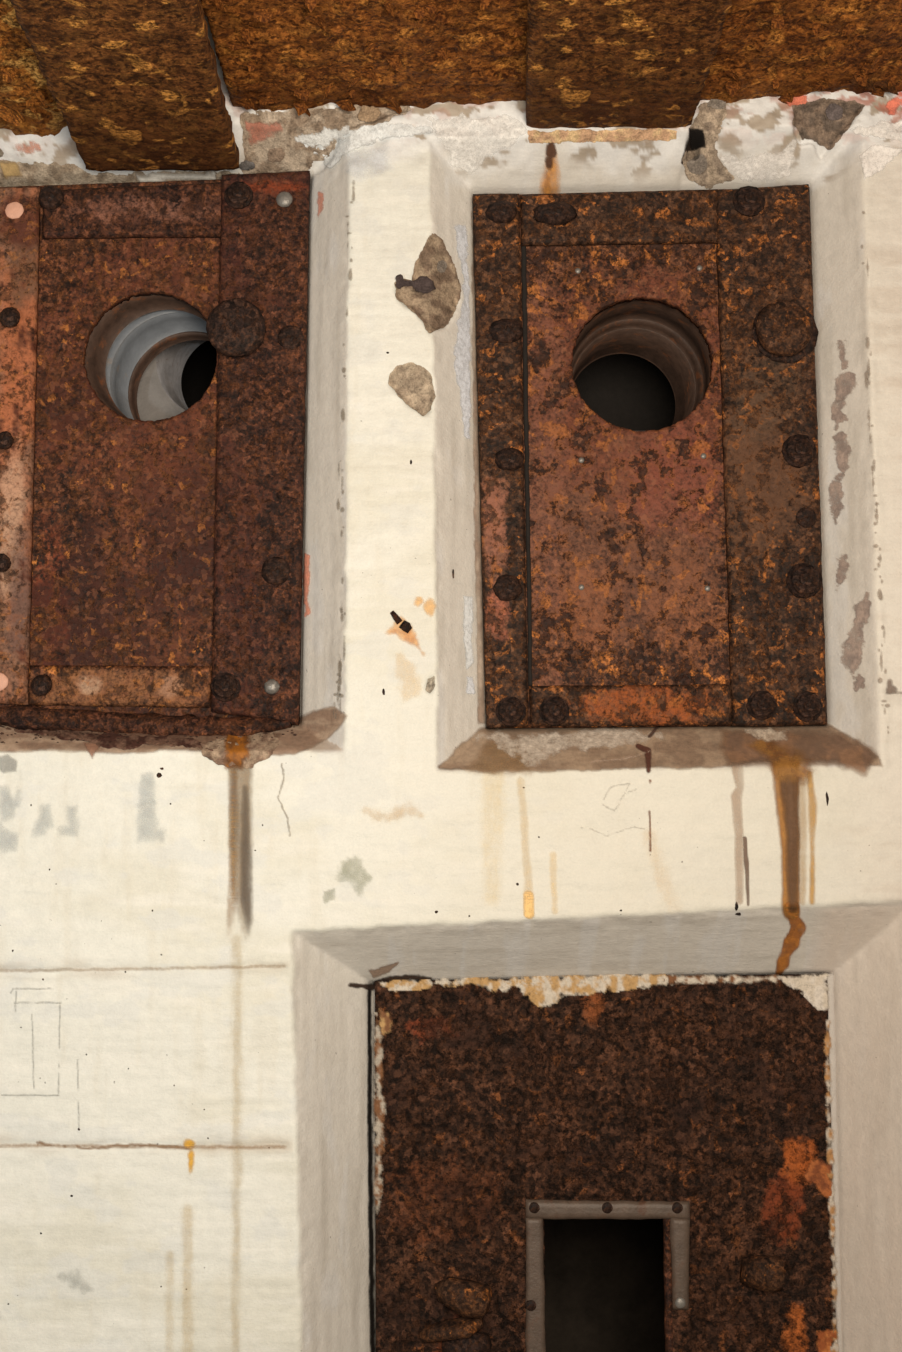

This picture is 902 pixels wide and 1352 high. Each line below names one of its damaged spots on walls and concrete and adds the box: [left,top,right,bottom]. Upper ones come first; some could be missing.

spalling [0,92,902,189]
peeling [829,340,870,524]
peeling [836,555,849,584]
peeling [841,463,886,692]
rust [0,705,292,921]
rust [755,740,816,975]